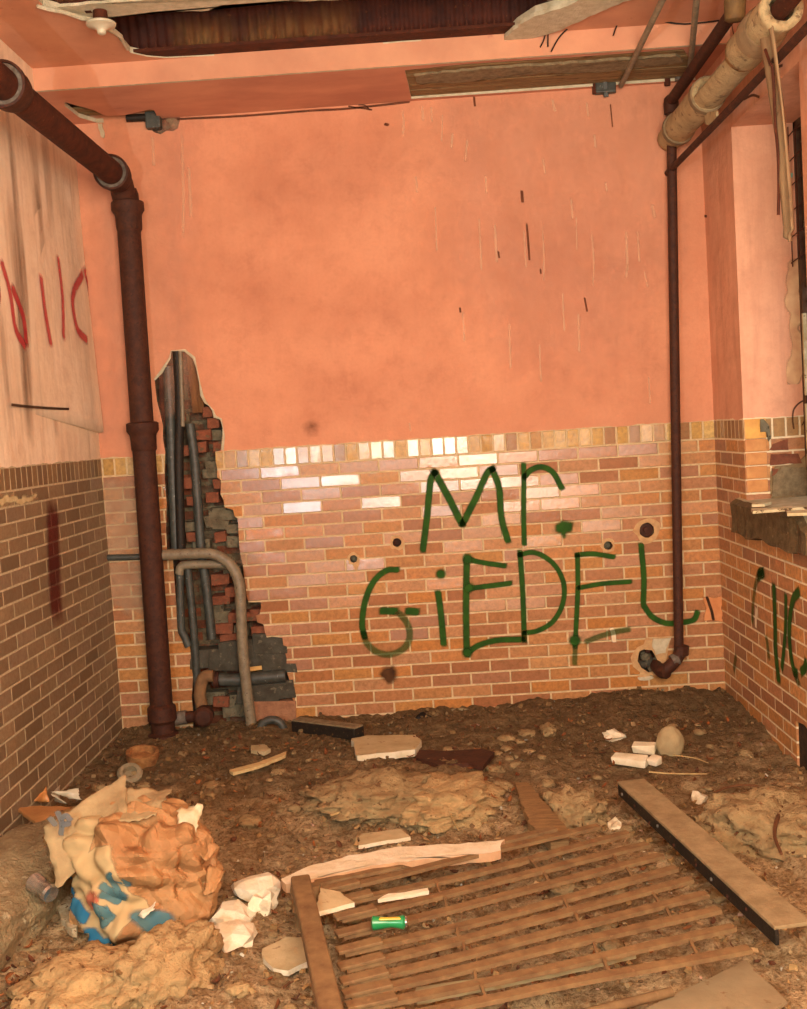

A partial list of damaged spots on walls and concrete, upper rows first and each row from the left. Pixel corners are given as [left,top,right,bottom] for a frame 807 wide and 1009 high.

spalling [36,4,93,21]
spalling [504,0,630,40]
spalling [107,28,128,51]
spalling [154,349,225,457]
flaking render [184,477,223,506]
flaking render [211,572,265,642]
flaking render [254,698,296,721]